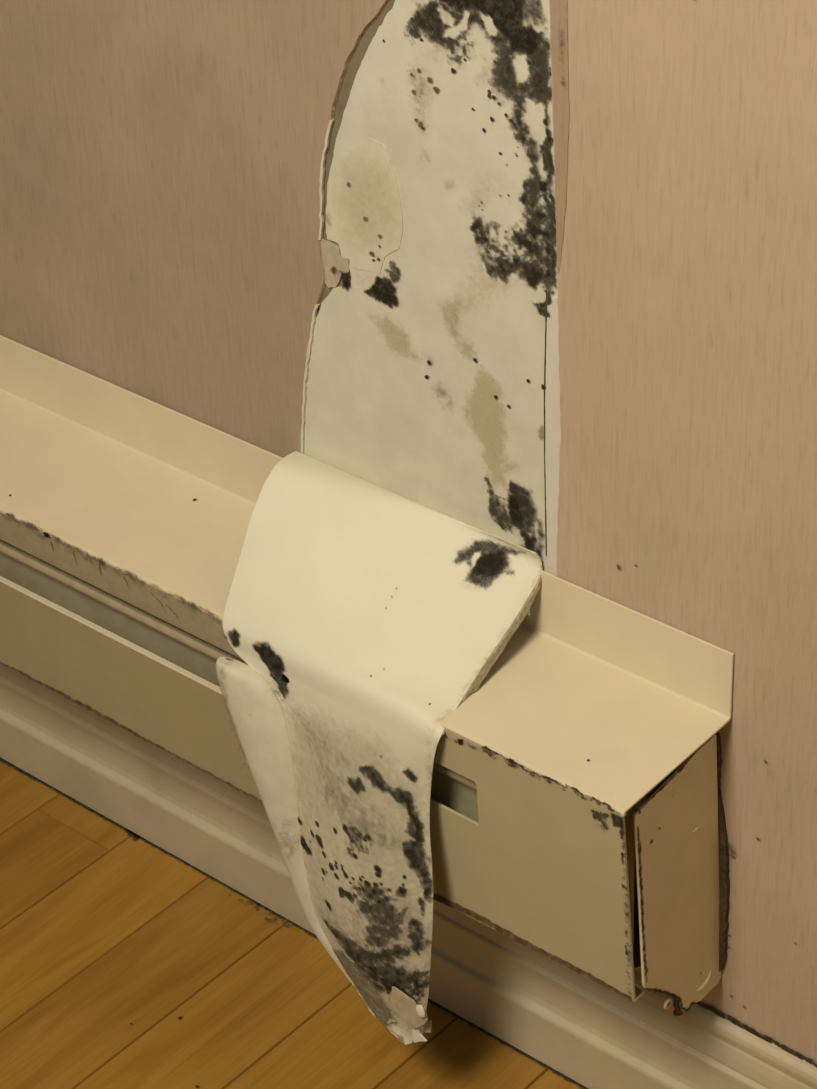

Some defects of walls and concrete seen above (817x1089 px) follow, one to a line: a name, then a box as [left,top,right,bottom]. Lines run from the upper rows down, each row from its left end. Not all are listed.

mould [406,0,557,318]
water stain [364,234,414,357]
water stain [455,345,544,587]